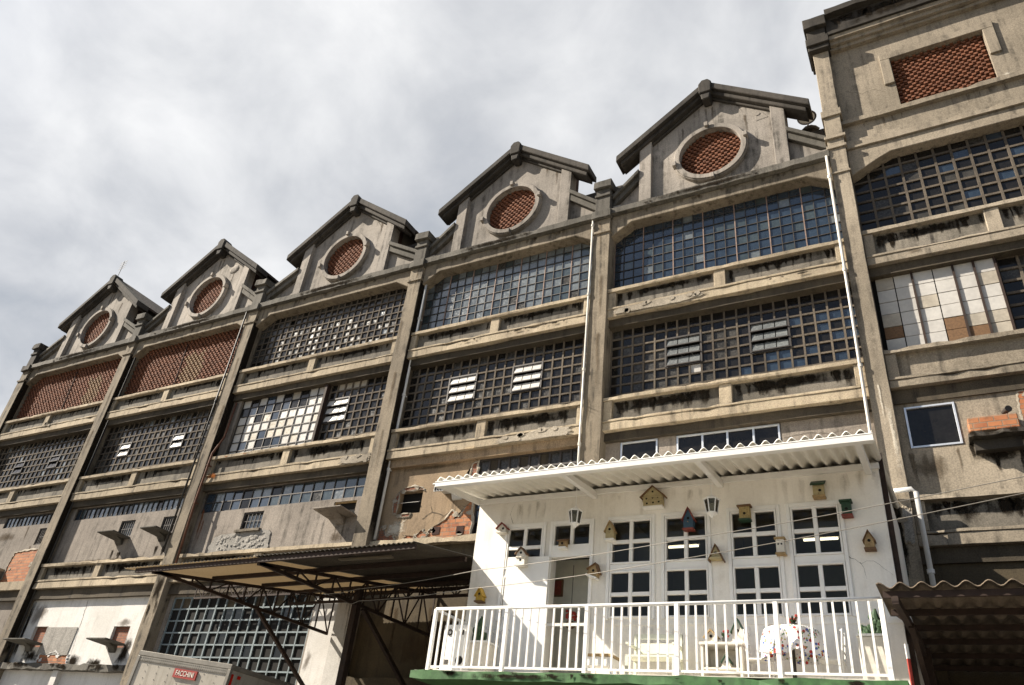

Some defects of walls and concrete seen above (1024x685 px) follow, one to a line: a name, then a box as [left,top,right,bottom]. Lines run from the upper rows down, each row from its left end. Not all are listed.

damp [876,215,984,247]
damp [734,369,852,396]
damp [615,389,709,415]
spalling [1016,390,1024,427]
spalling [375,484,474,541]
spalling [0,548,38,582]